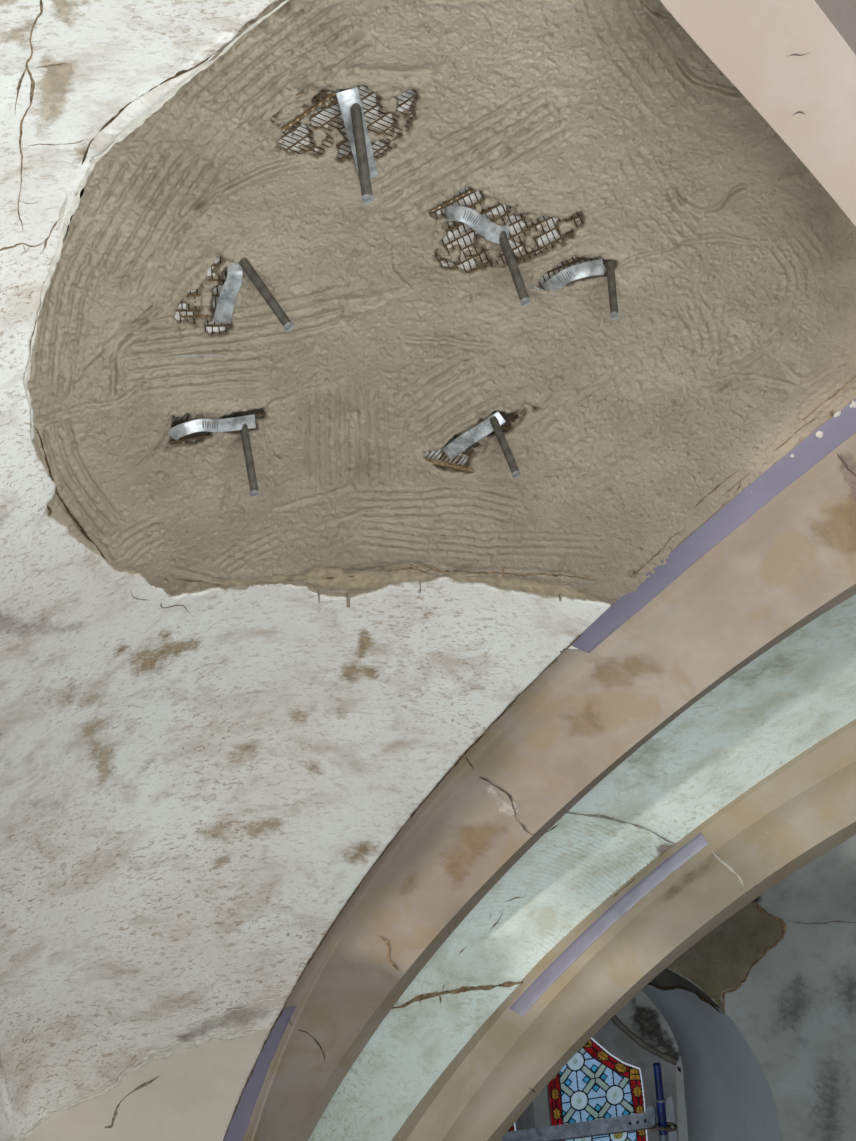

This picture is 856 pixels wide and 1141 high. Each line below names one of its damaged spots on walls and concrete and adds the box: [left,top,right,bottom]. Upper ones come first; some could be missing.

crack [0,0,87,253]
flaking render [27,0,856,604]
crack [775,376,856,451]
crack [631,471,752,576]
leakage [134,634,198,673]
leakage [343,632,376,681]
leakage [87,721,113,781]
leakage [250,819,281,836]
crack [223,635,676,1141]
crack [713,852,750,897]
flaking render [647,901,786,1014]
crack [104,1075,160,1129]